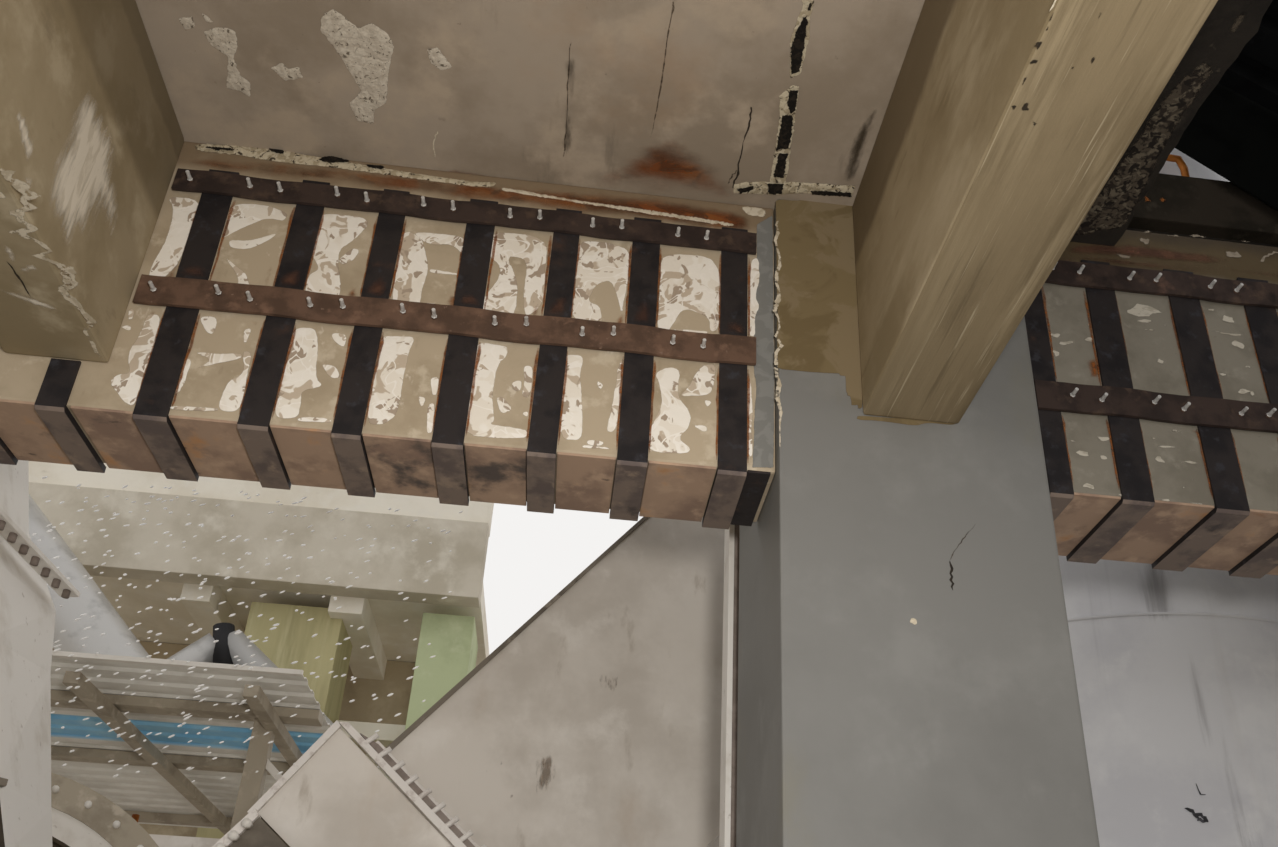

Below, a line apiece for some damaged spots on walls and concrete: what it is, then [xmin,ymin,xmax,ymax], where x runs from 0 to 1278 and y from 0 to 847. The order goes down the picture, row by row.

crack [563,44,571,151]
crack [653,2,674,127]
corrosion [636,151,702,179]
crack [728,107,752,188]
peeling [483,233,547,315]
peeling [573,241,629,321]
peeling [658,254,721,333]
peeling [275,328,339,423]
peeling [368,336,414,424]
peeling [466,343,533,438]
peeling [561,355,622,449]
crack [949,532,969,590]